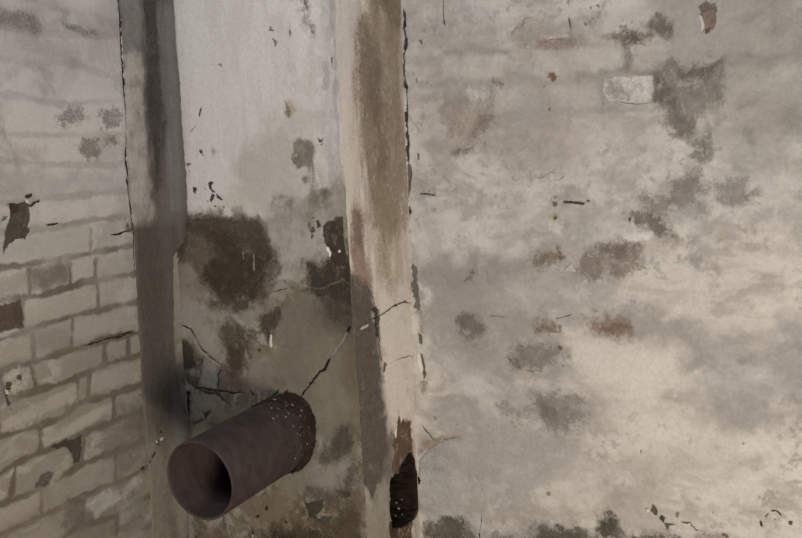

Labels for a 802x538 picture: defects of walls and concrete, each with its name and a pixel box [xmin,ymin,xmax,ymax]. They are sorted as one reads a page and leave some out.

crack [112,0,135,270]
damp [356,0,408,264]
crack [402,9,410,164]
peeling [603,75,654,105]
damp [653,58,722,163]
spalling [2,193,39,253]
damp [271,139,315,229]
spalling [0,300,24,332]
crack [181,325,243,403]
spalling [308,216,389,497]
crack [302,301,409,395]
damp [532,511,664,538]